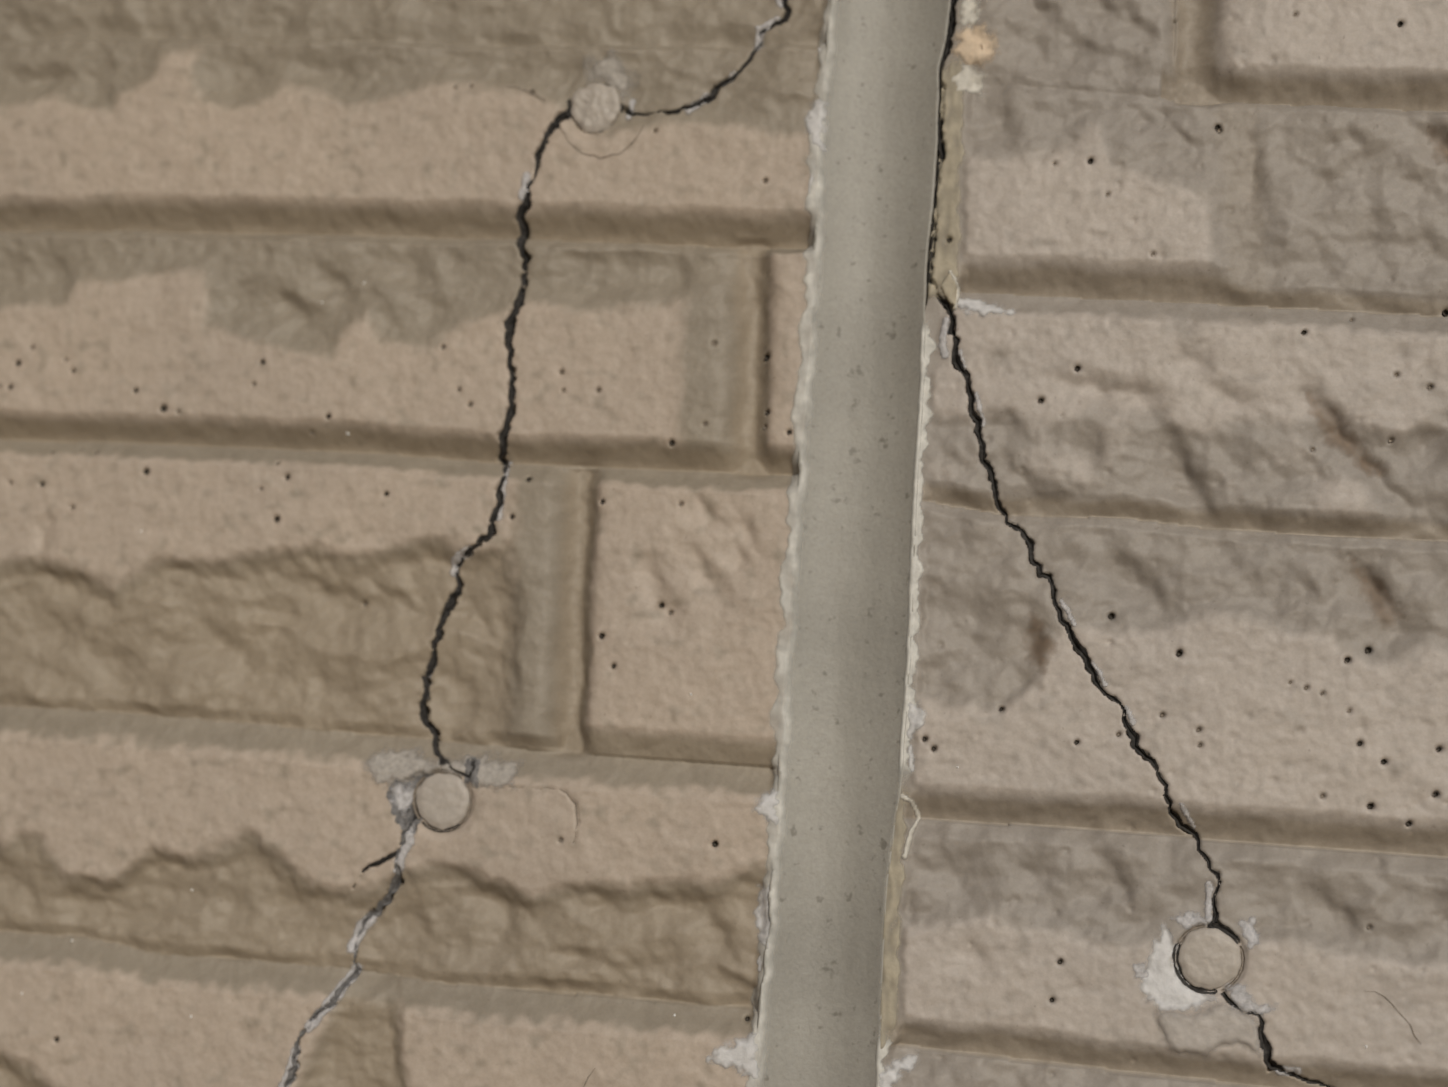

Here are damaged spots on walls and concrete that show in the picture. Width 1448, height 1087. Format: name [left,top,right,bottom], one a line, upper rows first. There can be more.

crack [419,0,792,843]
crack [928,0,1237,940]
crack [278,808,415,1087]
crack [1221,991,1330,1087]
crack [1369,991,1420,1042]